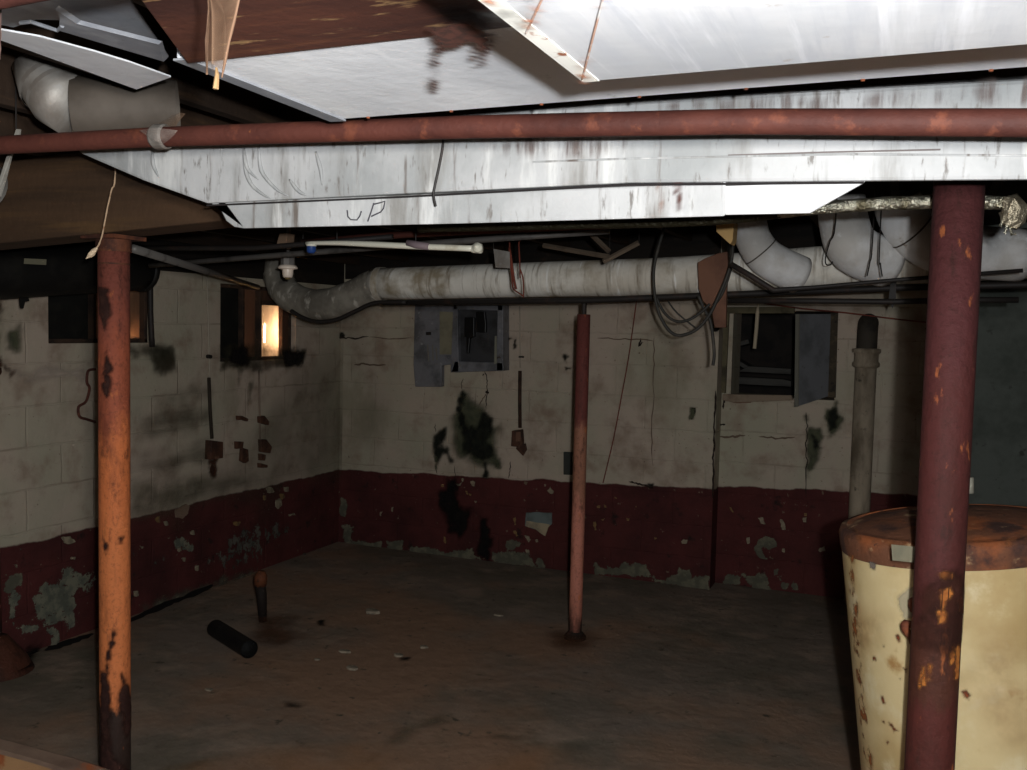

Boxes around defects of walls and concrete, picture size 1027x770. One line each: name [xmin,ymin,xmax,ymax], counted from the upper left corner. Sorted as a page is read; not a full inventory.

water stain [433,392,500,478]
water stain [805,402,843,493]
peeling [3,557,97,645]
peeling [505,512,552,555]
peeling [746,517,786,560]
corrosion [839,506,915,654]
corrosion [965,538,1027,571]